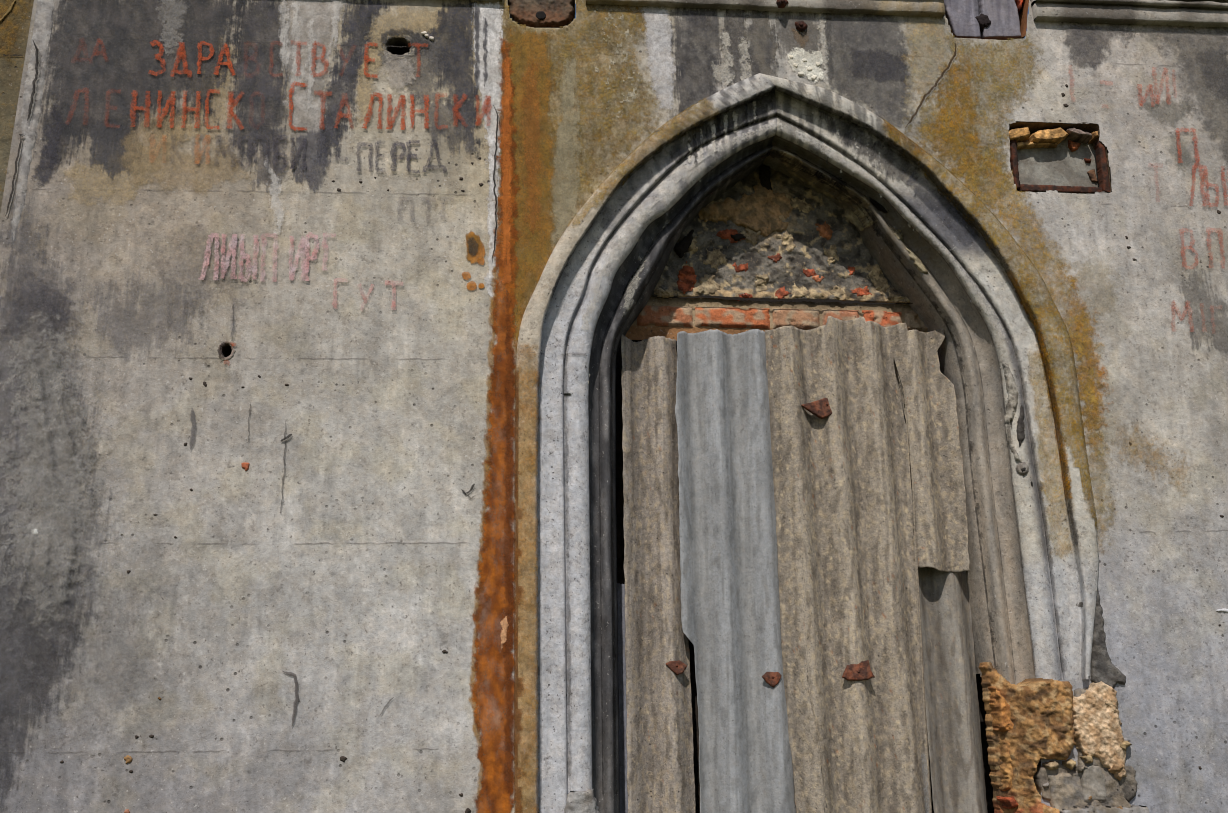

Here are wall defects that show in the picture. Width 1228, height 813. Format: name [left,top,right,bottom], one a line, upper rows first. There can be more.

water stain [33,38,240,204]
water stain [254,0,347,229]
spalling [654,147,928,305]
water stain [819,111,919,181]
crack [905,43,956,128]
water stain [852,18,1115,427]
corrosion [462,39,540,813]
spalling [978,662,1132,813]